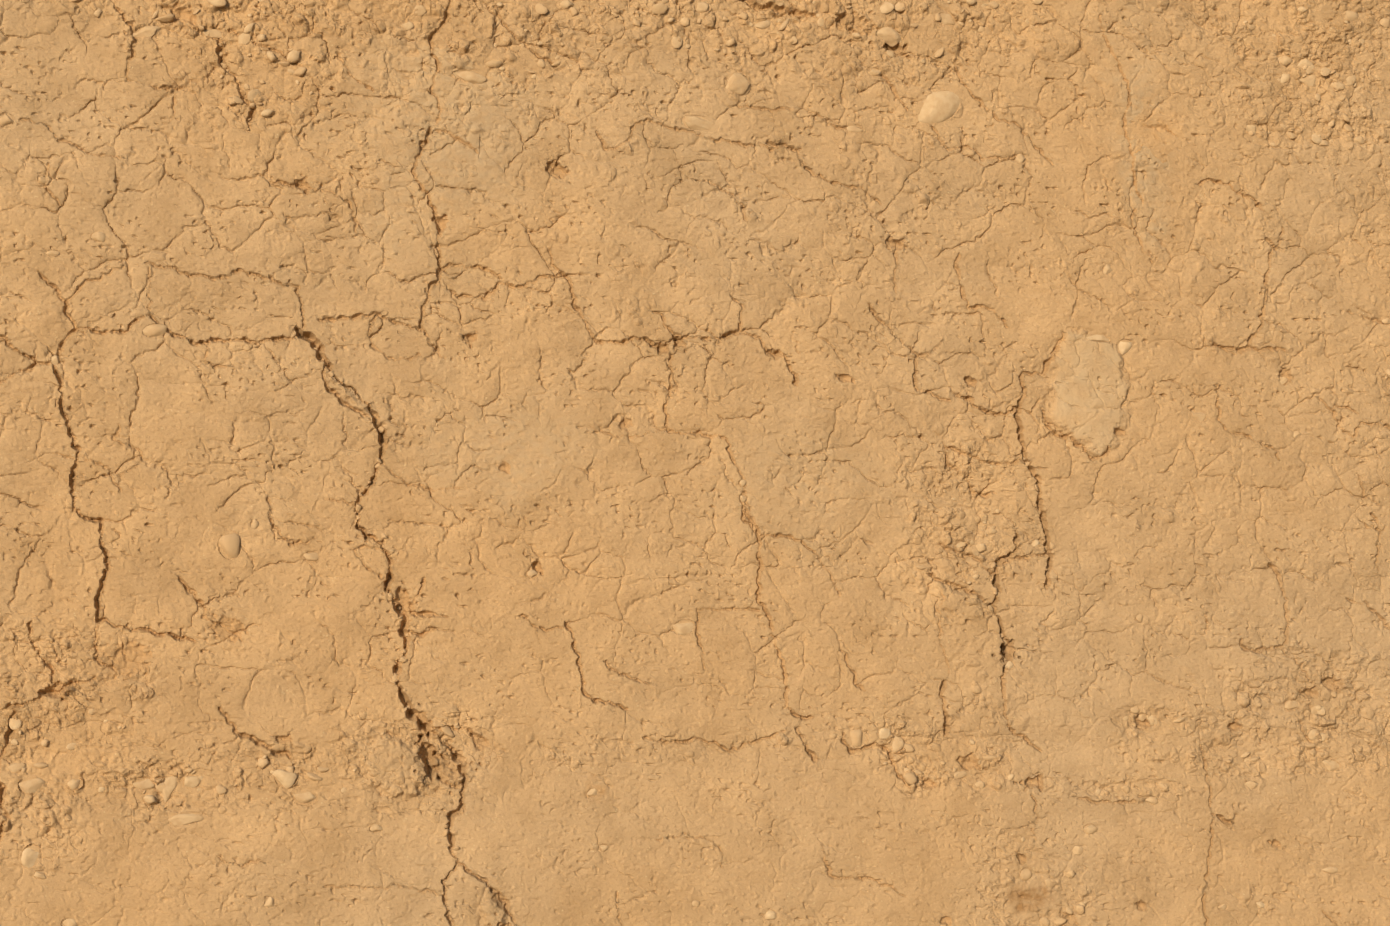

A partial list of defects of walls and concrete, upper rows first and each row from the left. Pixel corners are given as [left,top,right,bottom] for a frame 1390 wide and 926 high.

crack [1198,178,1287,355]
crack [0,0,911,926]
crack [868,241,1111,753]
crack [1201,384,1279,460]
crack [1312,393,1390,439]
crack [1346,474,1390,630]